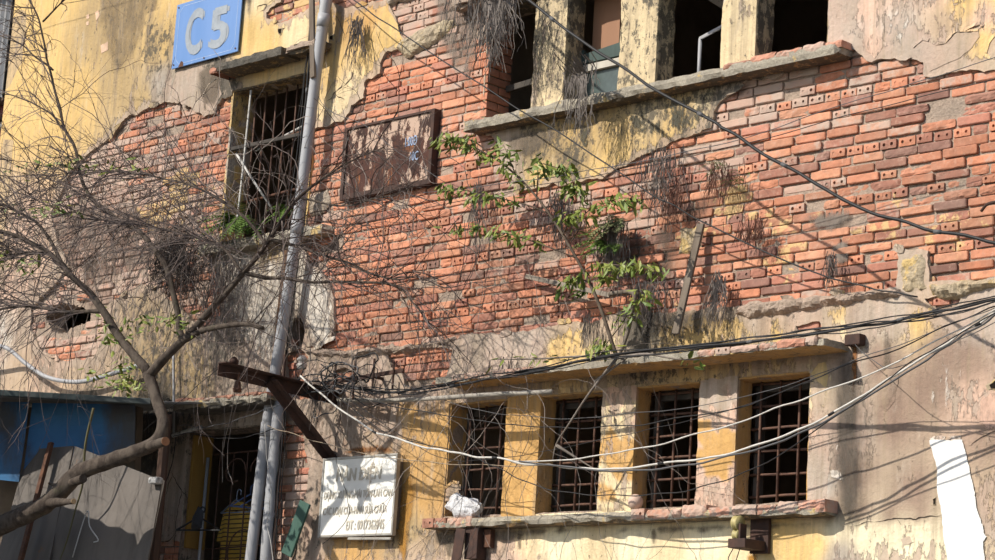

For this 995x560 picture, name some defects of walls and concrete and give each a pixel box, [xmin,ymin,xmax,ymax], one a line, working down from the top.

spalling [268,0,319,34]
mould [629,92,707,138]
spalling [287,0,995,391]
water stain [831,361,858,517]